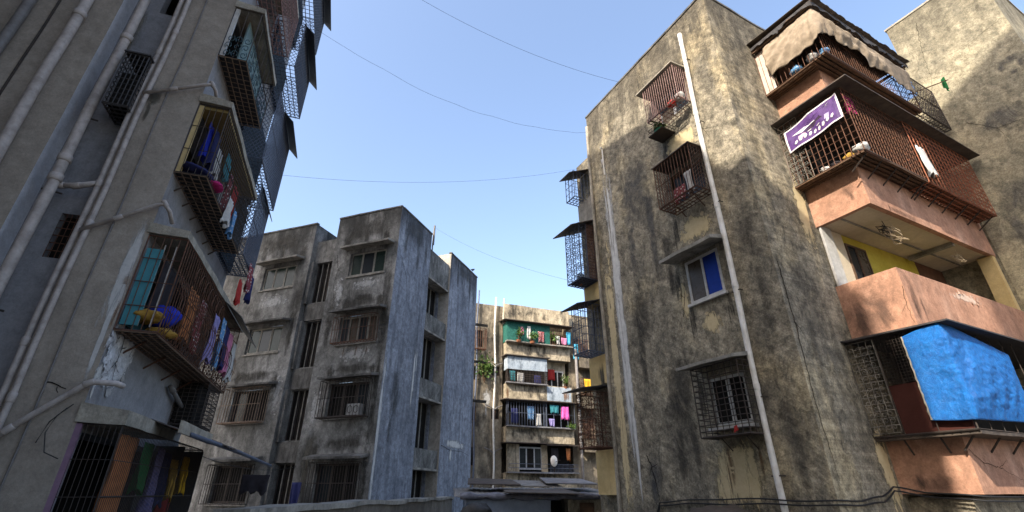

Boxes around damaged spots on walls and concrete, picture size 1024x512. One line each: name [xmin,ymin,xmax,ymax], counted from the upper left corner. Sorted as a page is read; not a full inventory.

leakage [323,273,398,500]
leakage [669,371,706,476]
leakage [714,438,767,511]